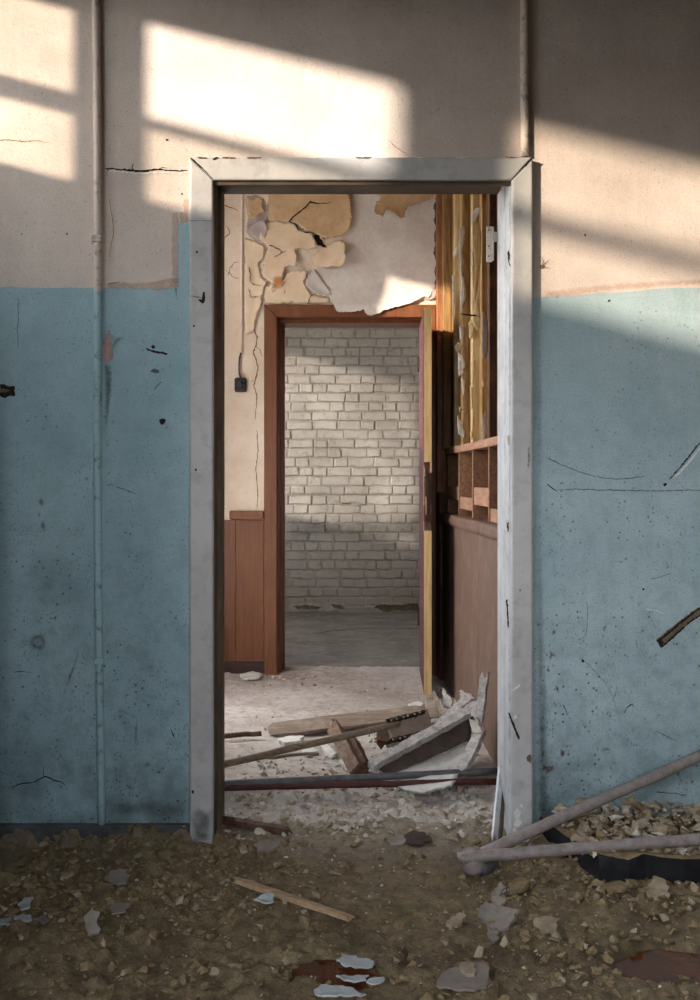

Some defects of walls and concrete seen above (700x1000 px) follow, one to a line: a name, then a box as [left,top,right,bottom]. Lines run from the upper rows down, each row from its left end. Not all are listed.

crack [105,158,212,178]
flaking render [244,194,436,333]
flaking render [0,384,15,398]
crack [251,330,262,506]
crack [548,458,700,492]
crack [12,768,65,787]